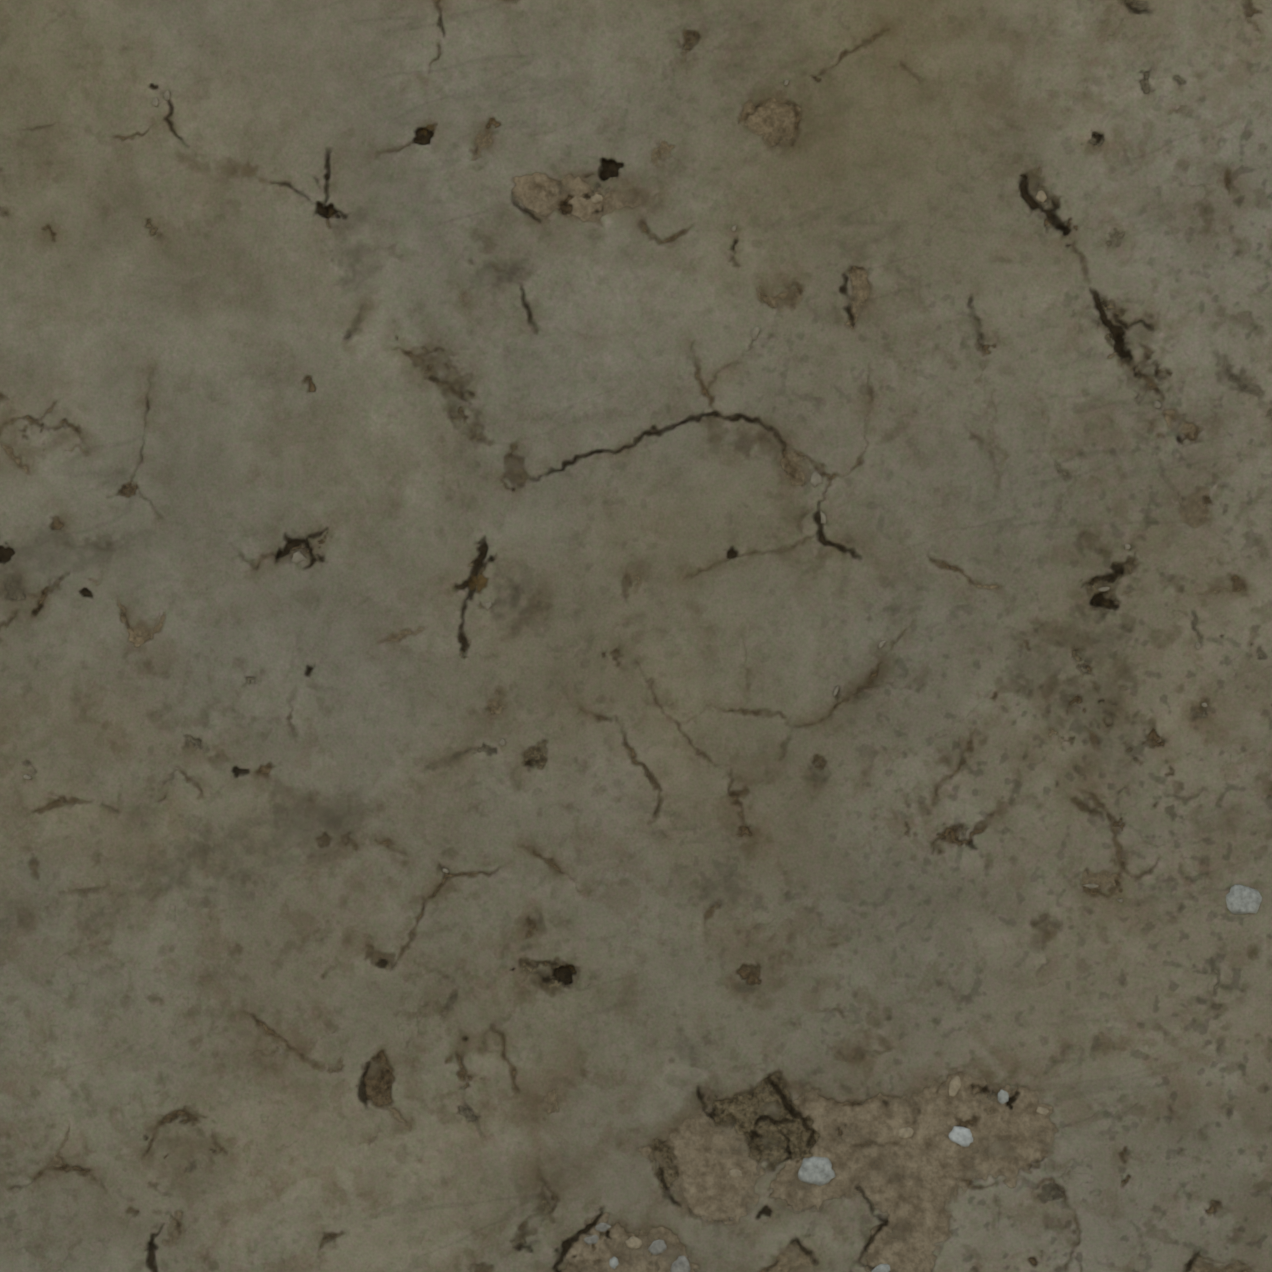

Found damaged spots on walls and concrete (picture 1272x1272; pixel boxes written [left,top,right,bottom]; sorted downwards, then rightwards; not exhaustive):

crack [116,84,182,140]
crack [281,153,347,227]
spalling [512,158,644,223]
crack [548,369,760,474]
crack [780,449,861,557]
crack [276,532,328,568]
crack [727,547,739,558]
crack [455,541,494,658]
spalling [356,1051,410,1128]
spalling [638,1069,1058,1272]
crack [146,1211,182,1272]
spalling [553,1212,699,1272]